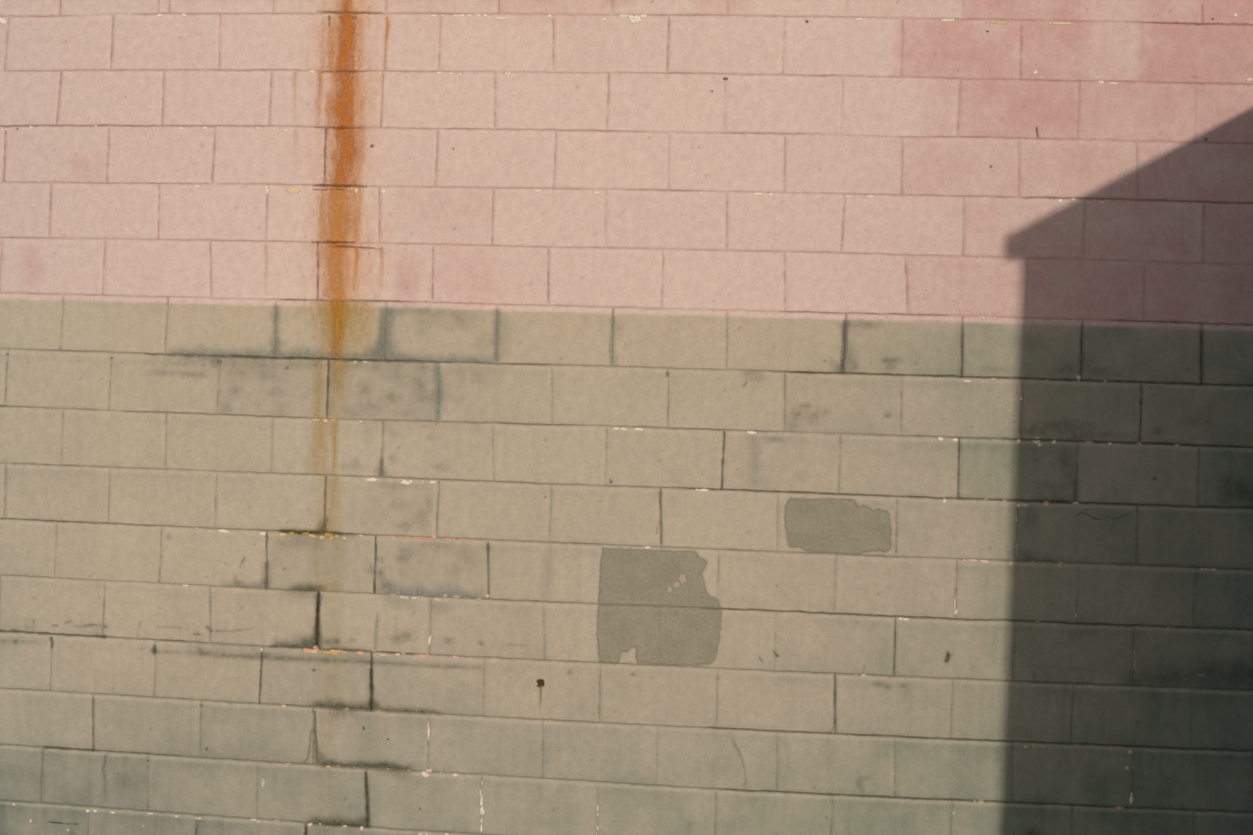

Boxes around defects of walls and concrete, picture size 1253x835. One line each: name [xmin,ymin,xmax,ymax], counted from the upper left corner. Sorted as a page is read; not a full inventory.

corrosion [316,0,374,379]